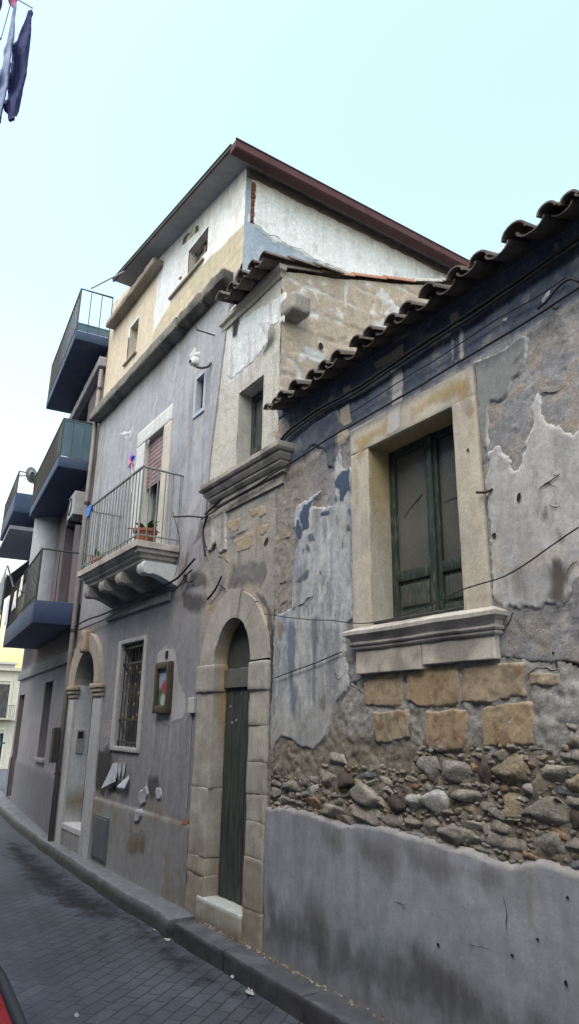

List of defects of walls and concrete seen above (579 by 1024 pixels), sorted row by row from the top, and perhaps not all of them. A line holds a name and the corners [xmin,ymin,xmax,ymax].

peeling [227,292,286,379]
spalling [250,182,344,271]
peeling [473,335,579,610]
spalling [267,385,579,869]